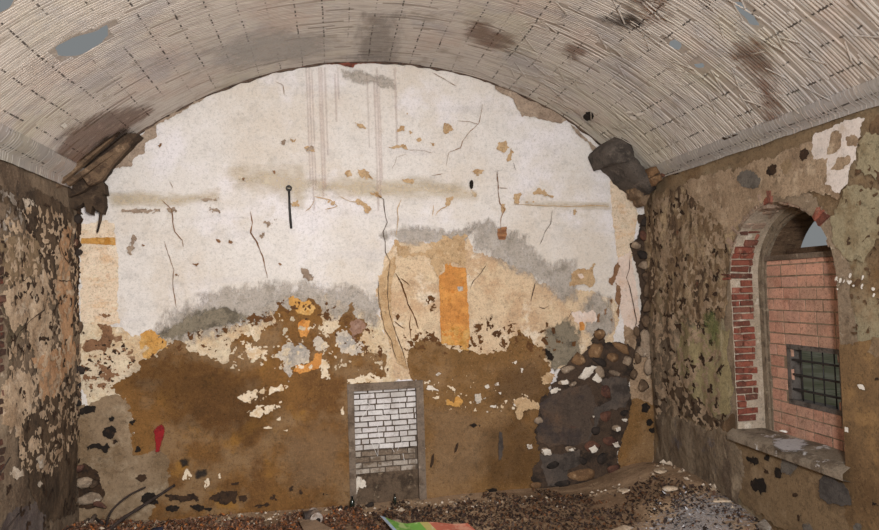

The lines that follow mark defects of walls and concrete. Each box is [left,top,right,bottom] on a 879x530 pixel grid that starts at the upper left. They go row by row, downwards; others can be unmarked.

leakage [80,129,132,169]
crack [392,104,483,175]
crack [250,212,268,278]
leakage [155,281,379,342]
crack [306,195,419,362]
spalling [0,115,879,530]